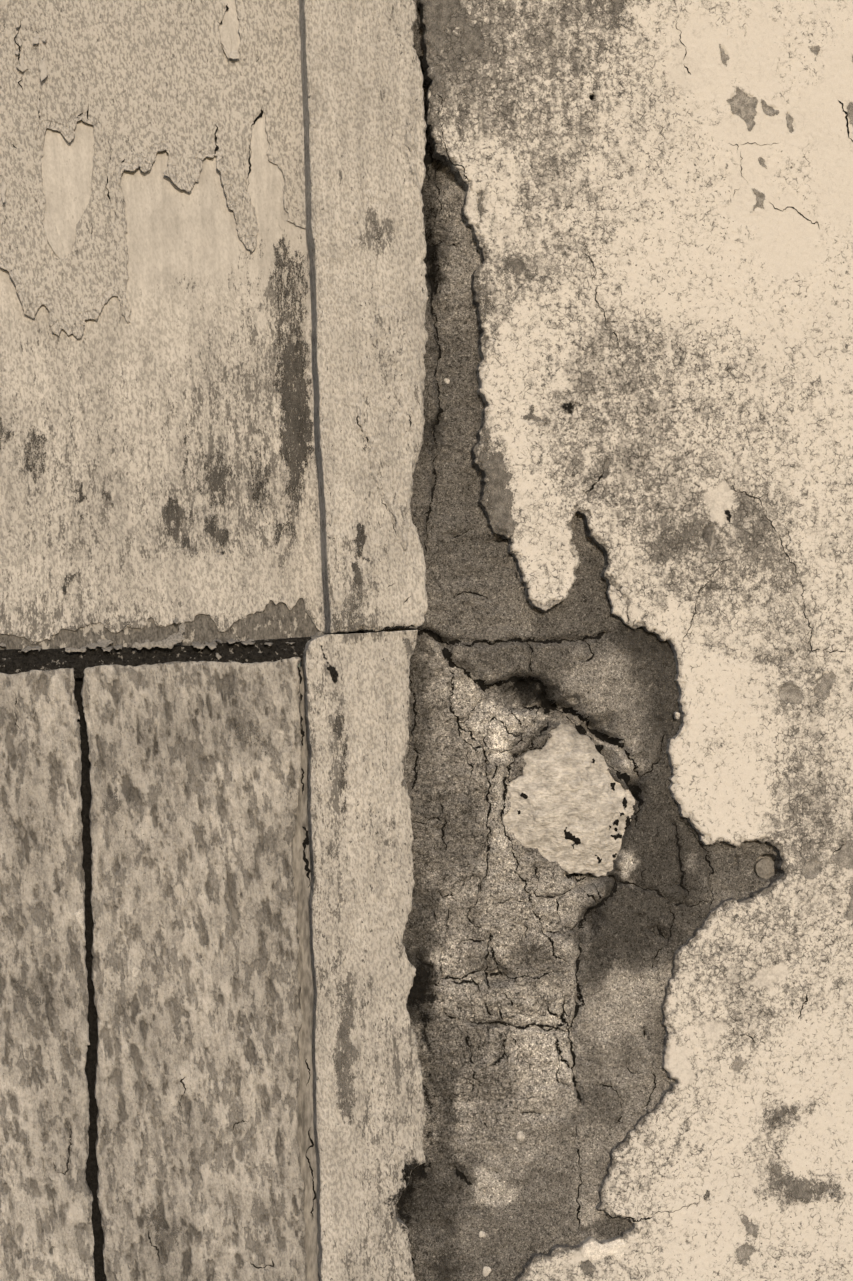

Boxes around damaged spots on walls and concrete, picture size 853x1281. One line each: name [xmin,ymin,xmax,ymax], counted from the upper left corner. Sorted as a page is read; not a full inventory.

peeling [36,99,102,259]
peeling [113,112,285,252]
peeling [219,0,248,61]
spalling [727,86,794,133]
peeling [0,256,124,362]
leakage [162,237,315,555]
spalling [355,0,779,1281]
crack [359,584,714,1227]